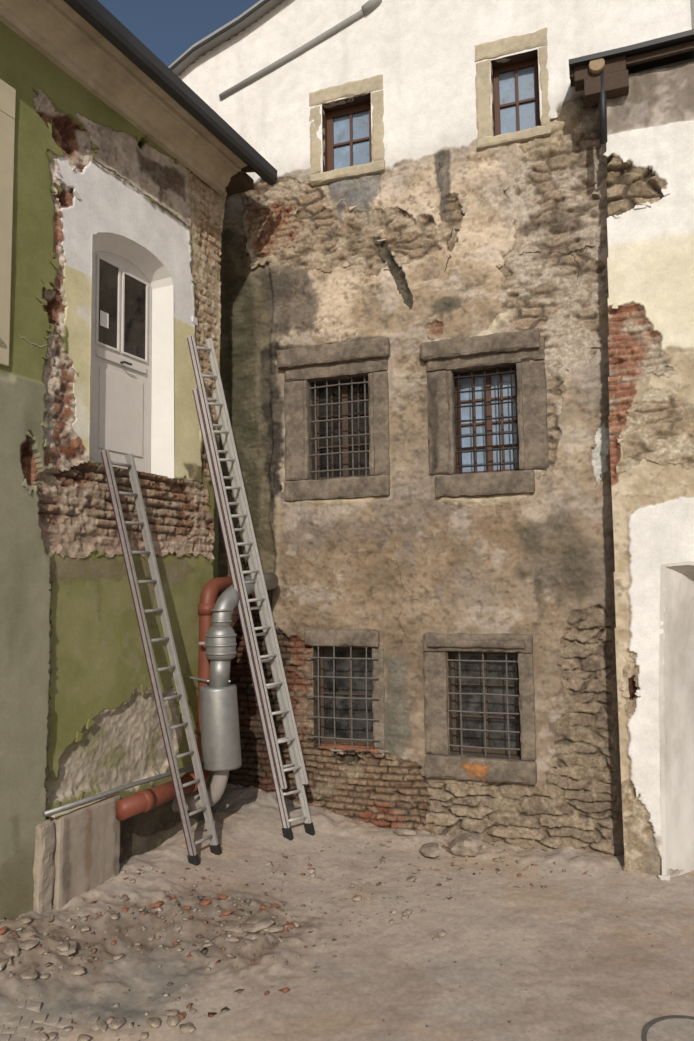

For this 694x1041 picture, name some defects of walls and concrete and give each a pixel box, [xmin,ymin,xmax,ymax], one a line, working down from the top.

flaking render [21,85,227,564]
spalling [239,177,467,310]
flaking render [424,321,444,340]
spalling [496,104,694,486]
peeling [45,685,183,807]
spalling [227,593,670,880]
corrosion [463,763,488,777]